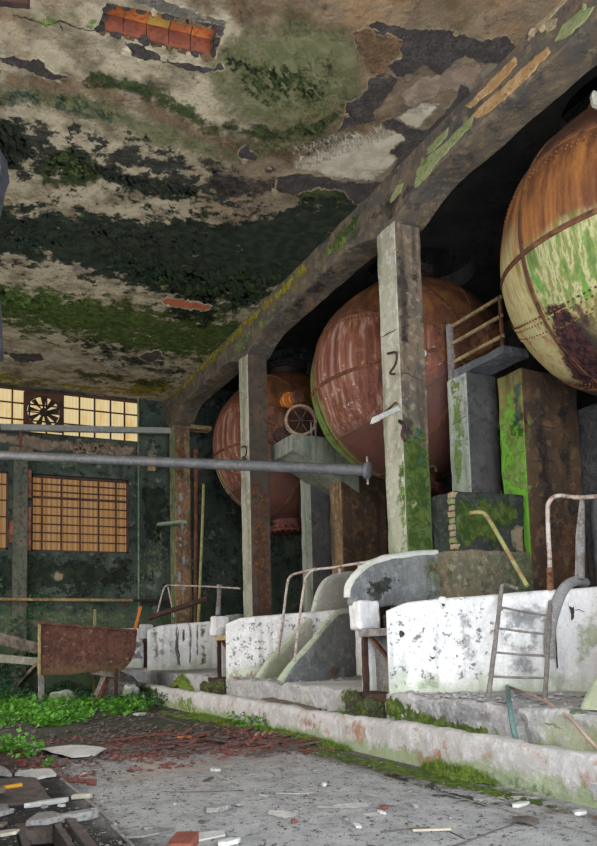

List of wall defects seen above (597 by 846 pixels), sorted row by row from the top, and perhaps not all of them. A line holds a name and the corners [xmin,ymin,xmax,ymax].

spalling [94,0,228,75]
leakage [255,63,484,181]
spalling [264,0,595,206]
leakage [0,116,357,319]
leakage [374,185,413,220]
spalling [160,295,212,312]
leakage [397,252,418,342]